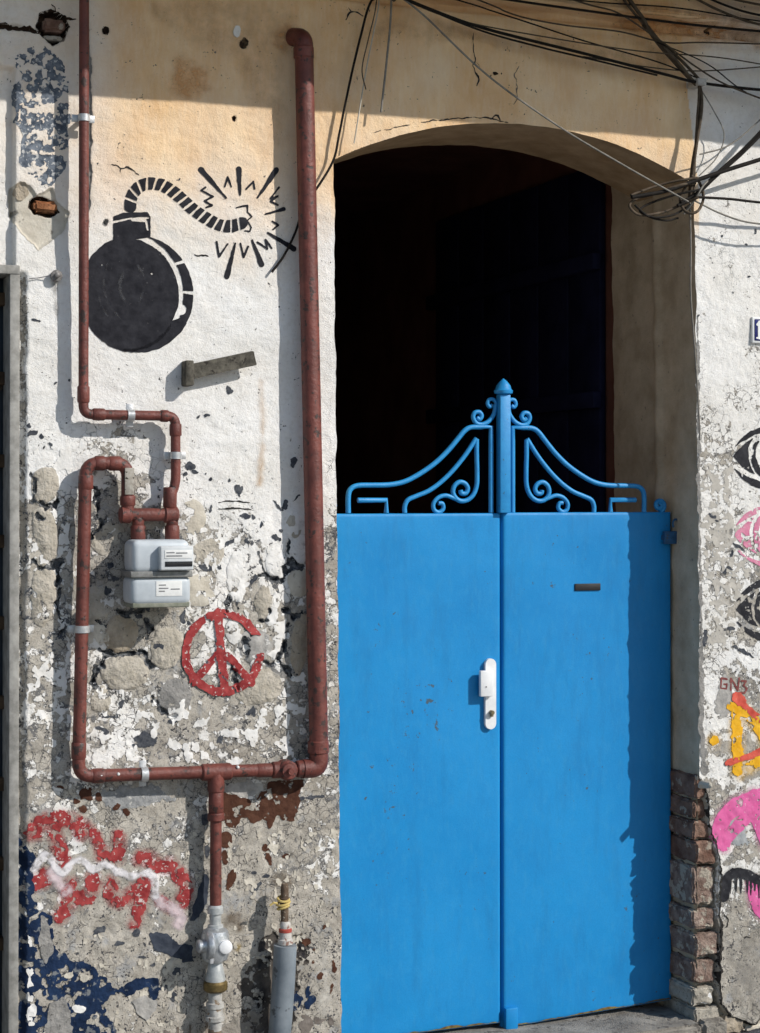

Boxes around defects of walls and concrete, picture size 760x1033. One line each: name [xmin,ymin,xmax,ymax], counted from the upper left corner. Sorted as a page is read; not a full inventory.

peeling [8,9,71,251]
peeling [24,423,72,571]
peeling [183,461,212,481]
peeling [192,494,300,629]
peeling [26,638,75,747]
peeling [86,644,309,766]
flaking render [663,314,760,1033]
peeling [224,779,263,798]
peeling [18,838,199,1033]
peeling [185,832,210,921]
flaking render [221,828,338,1033]
crack [704,788,760,1025]